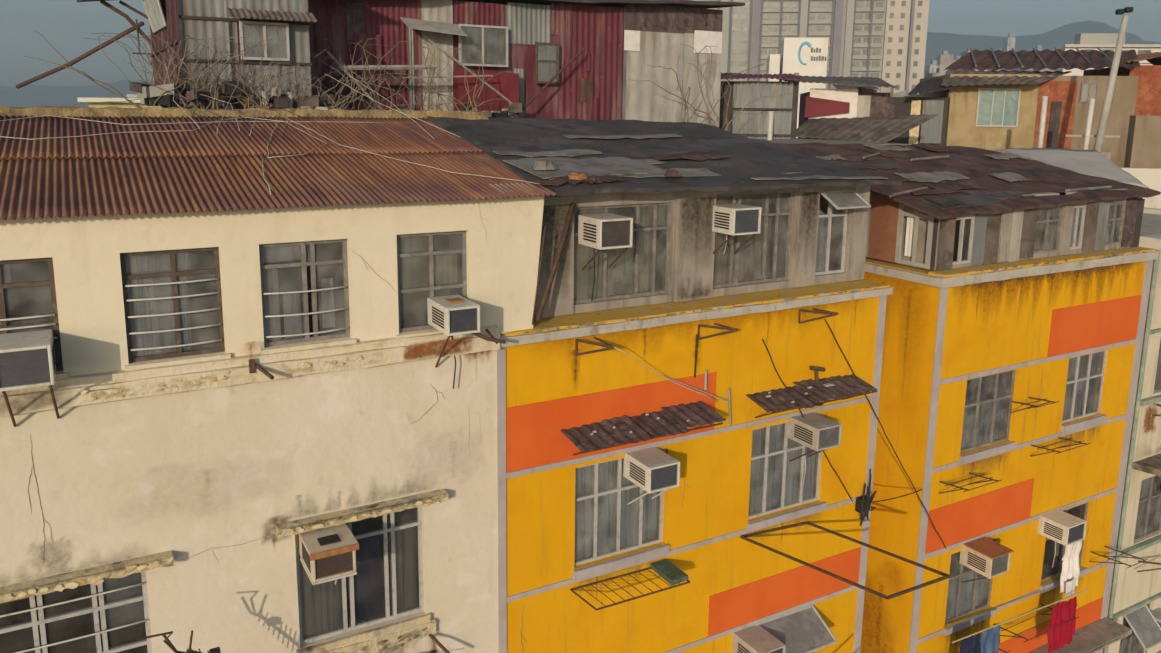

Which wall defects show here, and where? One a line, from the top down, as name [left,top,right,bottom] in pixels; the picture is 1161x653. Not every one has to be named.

water stain [542,204,570,251]
water stain [682,197,713,235]
rust [404,337,489,359]
crack [413,385,481,452]
crack [28,437,53,551]
water stain [265,497,431,540]
peeling [287,499,441,533]
peeling [0,561,160,603]